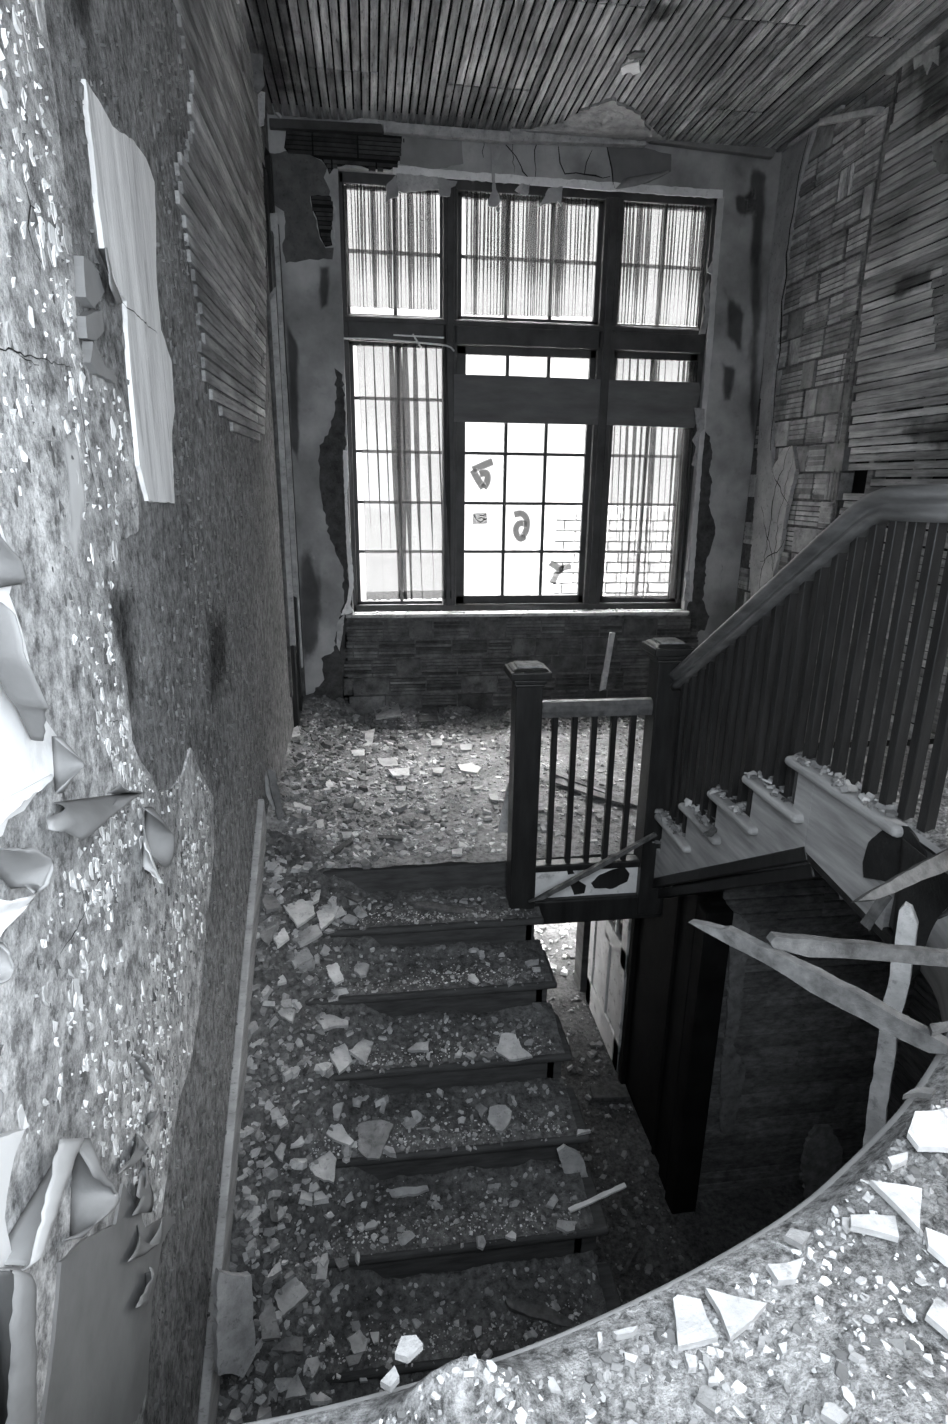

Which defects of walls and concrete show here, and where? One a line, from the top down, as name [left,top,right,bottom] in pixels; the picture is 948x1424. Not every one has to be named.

spalling [270,131,463,263]
crack [482,144,614,186]
spalling [0,0,284,1424]
flaking render [313,369,715,754]